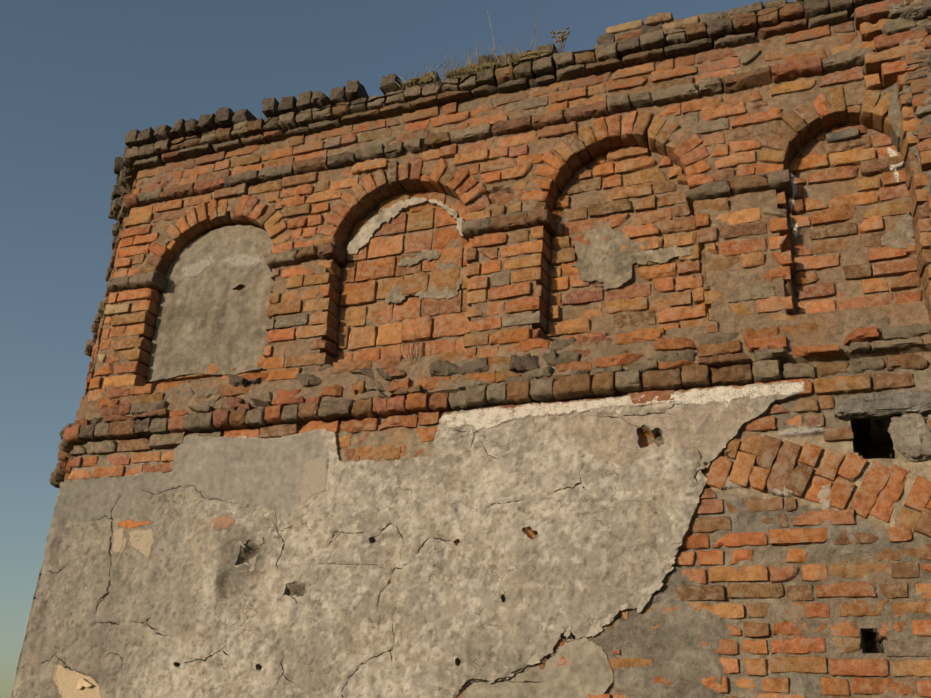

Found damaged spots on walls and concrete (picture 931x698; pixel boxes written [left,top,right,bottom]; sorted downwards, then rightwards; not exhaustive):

hole [632,425,672,453]
spalling [112,519,155,558]
crack [94,485,234,637]
hole [236,536,264,572]
crack [275,513,292,570]
hole [276,580,310,600]
peeling [585,536,684,637]
crack [309,523,451,698]
crack [42,654,98,683]
peeling [53,664,101,698]
crack [184,646,230,663]
crack [456,641,561,697]